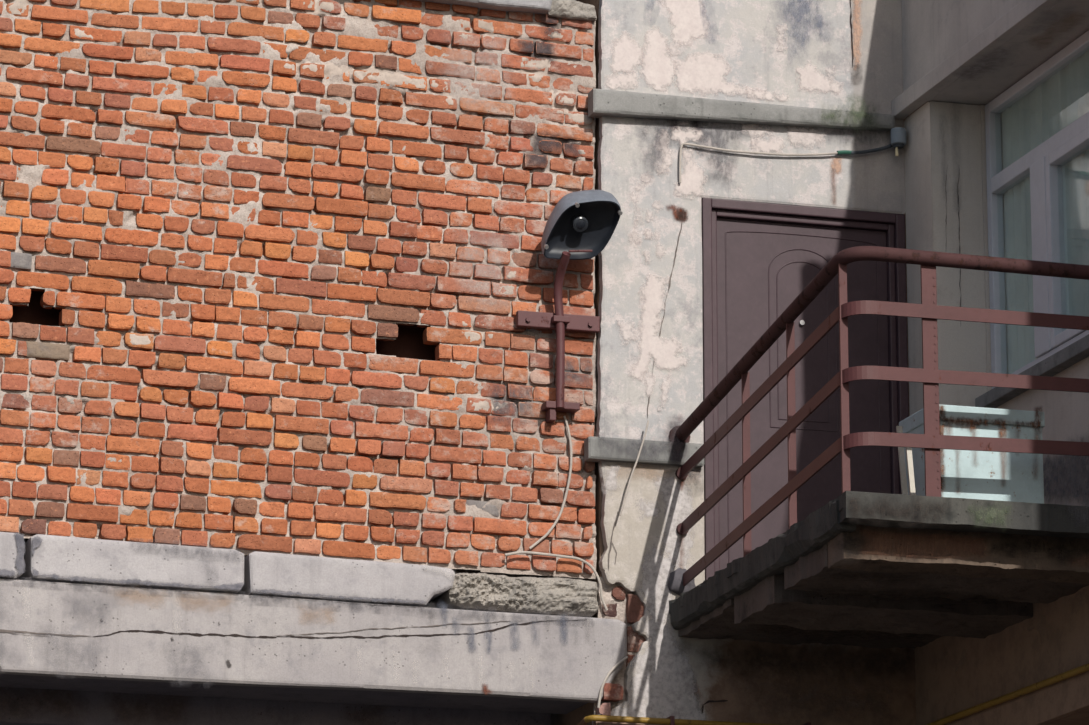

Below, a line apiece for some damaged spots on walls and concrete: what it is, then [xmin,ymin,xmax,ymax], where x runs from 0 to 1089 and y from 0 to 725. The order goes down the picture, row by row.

peeling [606,0,787,101]
peeling [796,64,842,93]
flaking render [850,0,862,68]
hole [9,291,61,326]
hole [376,324,437,361]
peeling [617,275,687,411]
crack [647,224,682,418]
peeling [606,466,618,491]
crack [0,619,587,639]
peeling [593,476,705,720]